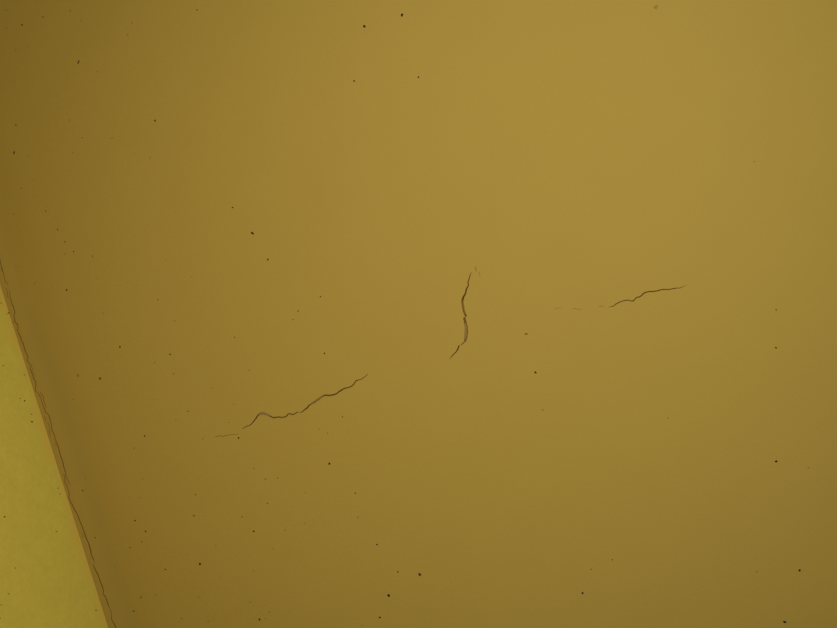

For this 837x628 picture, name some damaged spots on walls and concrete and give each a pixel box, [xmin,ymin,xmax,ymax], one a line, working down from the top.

crack [449,267,476,360]
crack [598,286,684,307]
crack [0,261,116,628]
crack [216,374,368,437]